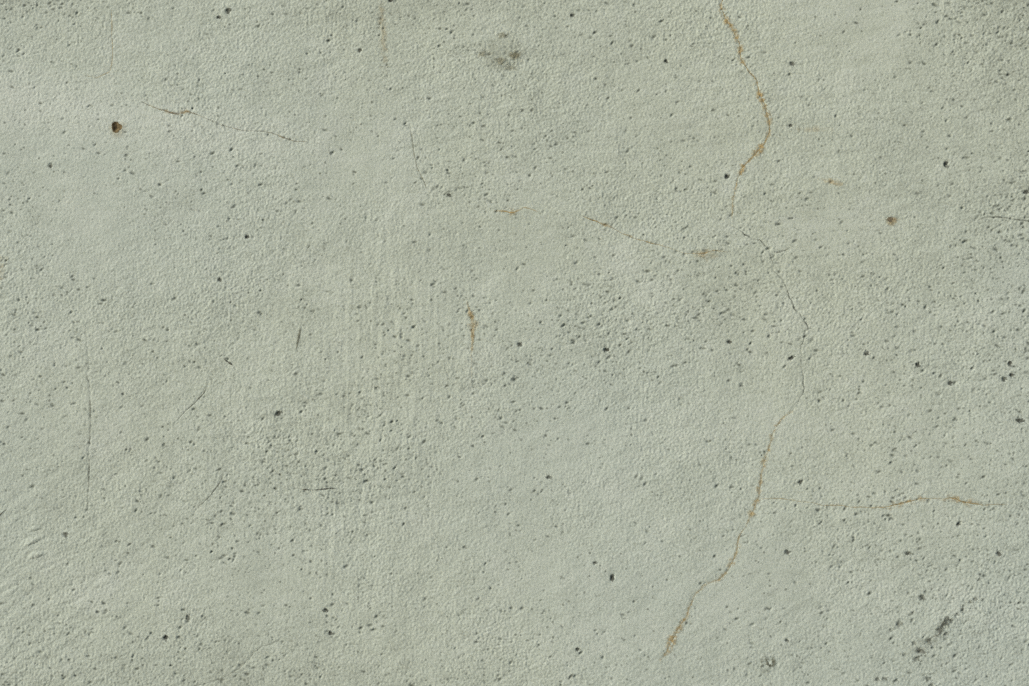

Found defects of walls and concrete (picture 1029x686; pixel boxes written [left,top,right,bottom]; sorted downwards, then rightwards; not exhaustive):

crack [721,0,770,173]